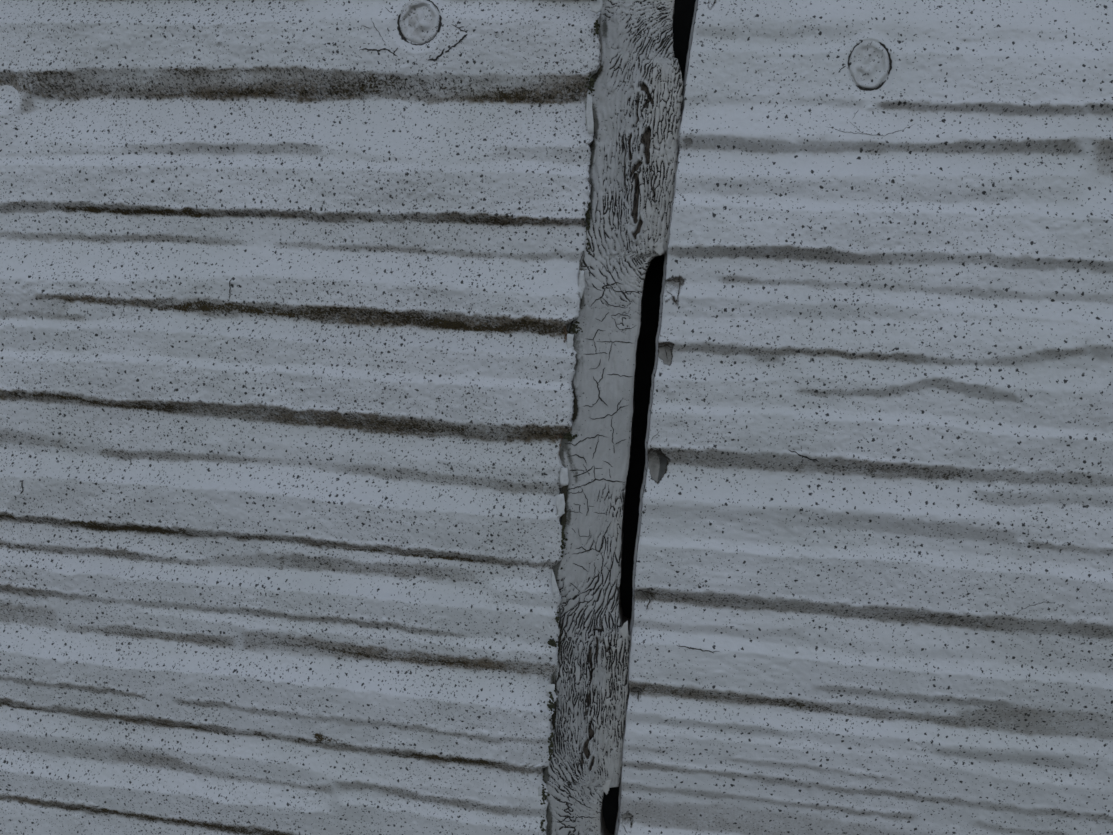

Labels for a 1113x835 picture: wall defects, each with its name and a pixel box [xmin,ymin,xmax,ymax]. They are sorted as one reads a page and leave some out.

crack [548,0,684,835]